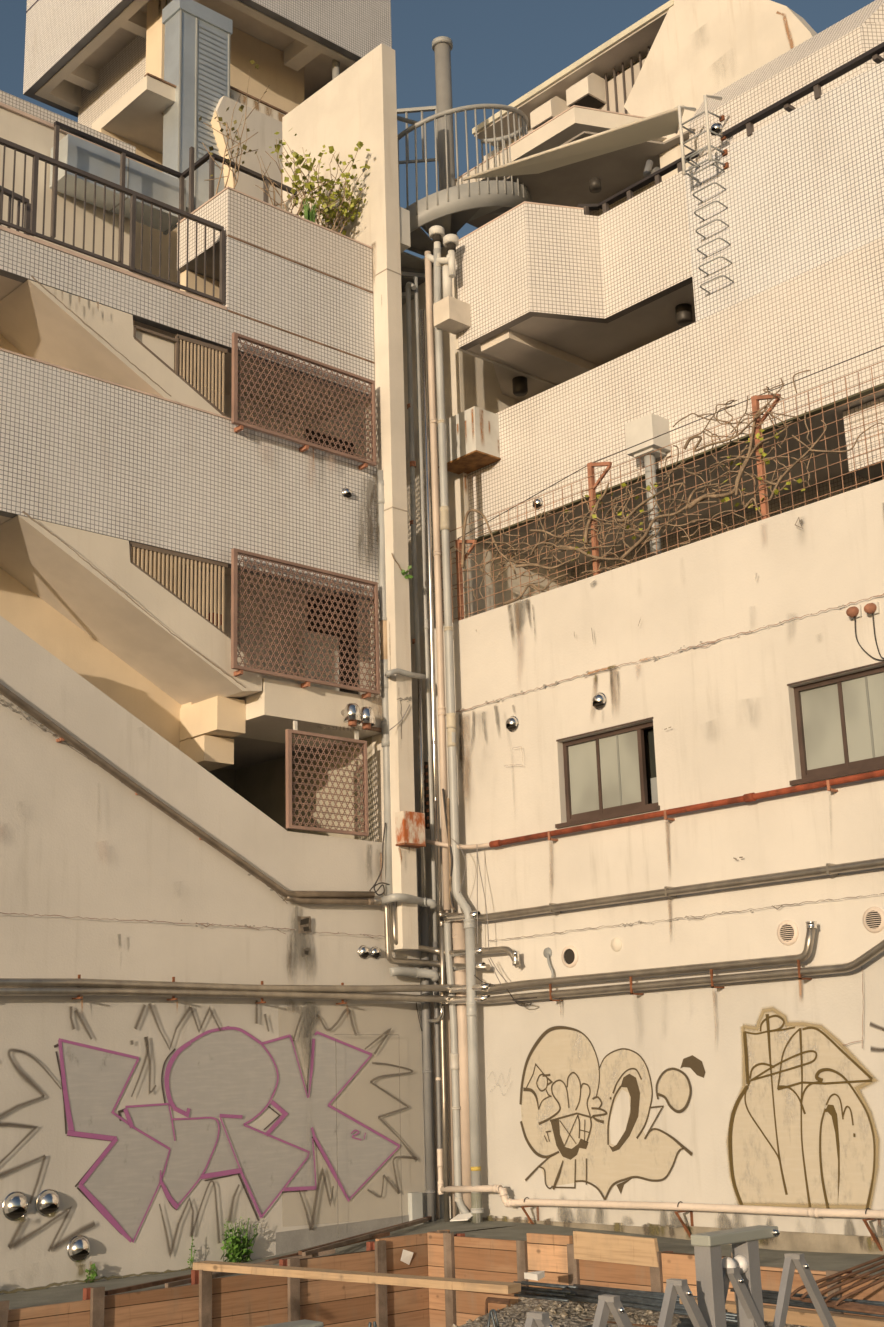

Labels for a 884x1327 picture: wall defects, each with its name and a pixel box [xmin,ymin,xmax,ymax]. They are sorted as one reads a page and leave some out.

leakage [508,599,535,634]